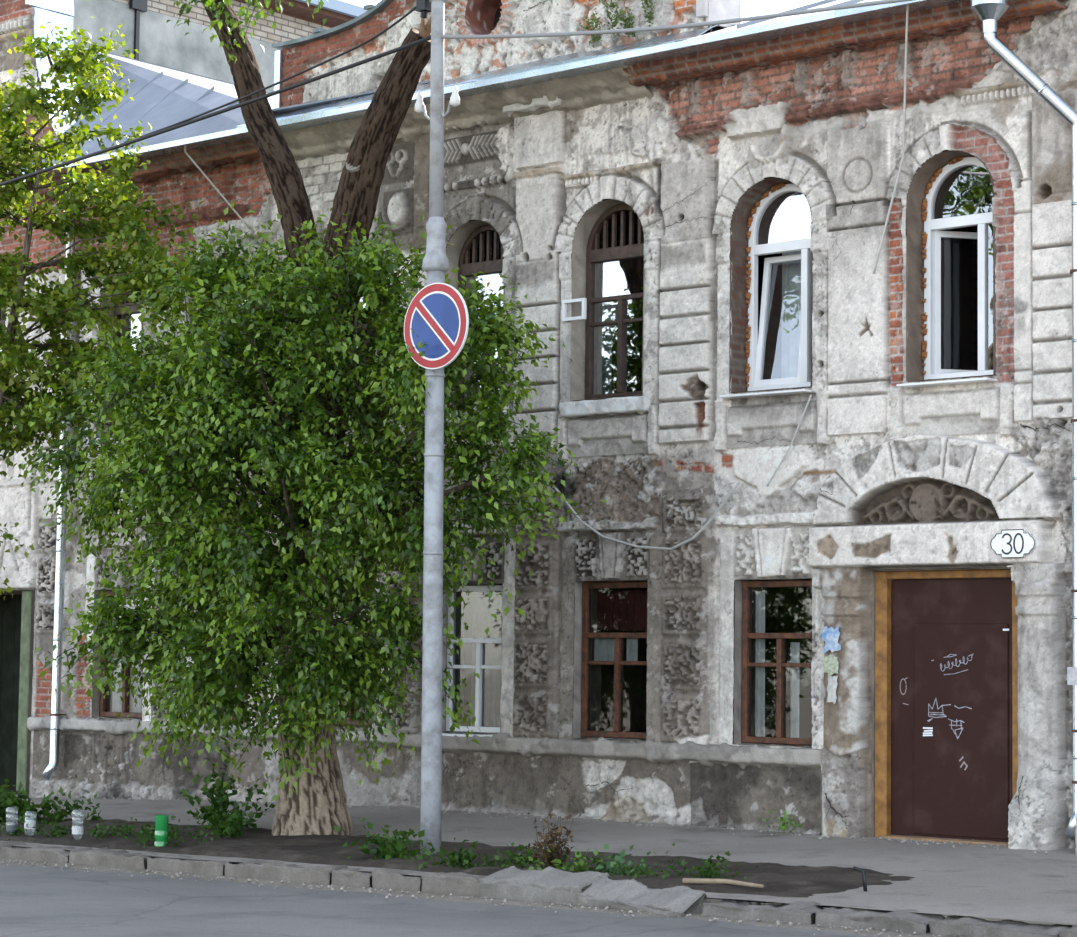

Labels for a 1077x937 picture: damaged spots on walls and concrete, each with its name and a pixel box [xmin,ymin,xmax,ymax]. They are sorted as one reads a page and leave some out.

flaking render [579,0,1077,163]
flaking render [889,198,904,386]
flaking render [950,124,1016,384]
rust [697,403,705,429]